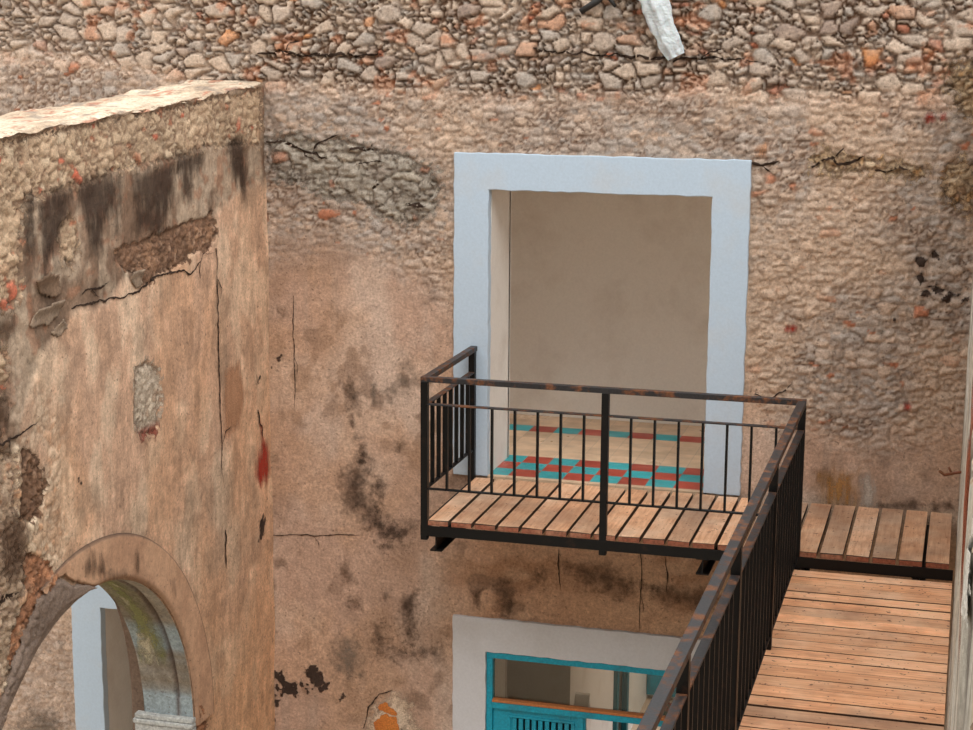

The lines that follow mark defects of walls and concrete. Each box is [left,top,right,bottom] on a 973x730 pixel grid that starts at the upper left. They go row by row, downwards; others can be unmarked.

crack [257,41,382,58]
crack [533,47,767,63]
water stain [27,174,120,273]
water stain [134,154,204,229]
spalling [0,87,446,337]
water stain [228,135,246,193]
crack [266,135,381,189]
spalling [915,250,969,304]
crack [71,248,230,482]
water stain [344,452,407,537]
spalling [0,448,97,730]
peeling [305,665,330,694]